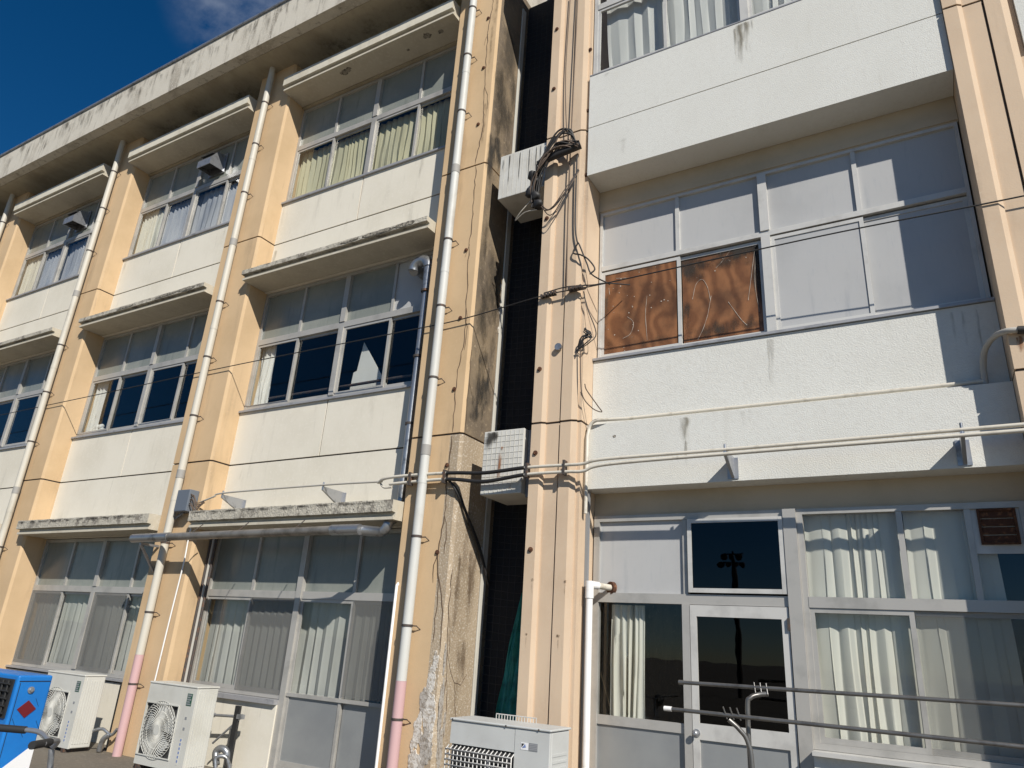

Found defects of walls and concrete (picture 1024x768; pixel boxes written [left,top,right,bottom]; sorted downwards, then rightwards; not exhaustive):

leakage [498,32,515,119]
leakage [488,138,541,178]
crack [433,1,494,732]
leakage [474,379,489,418]
peeling [408,643,447,768]